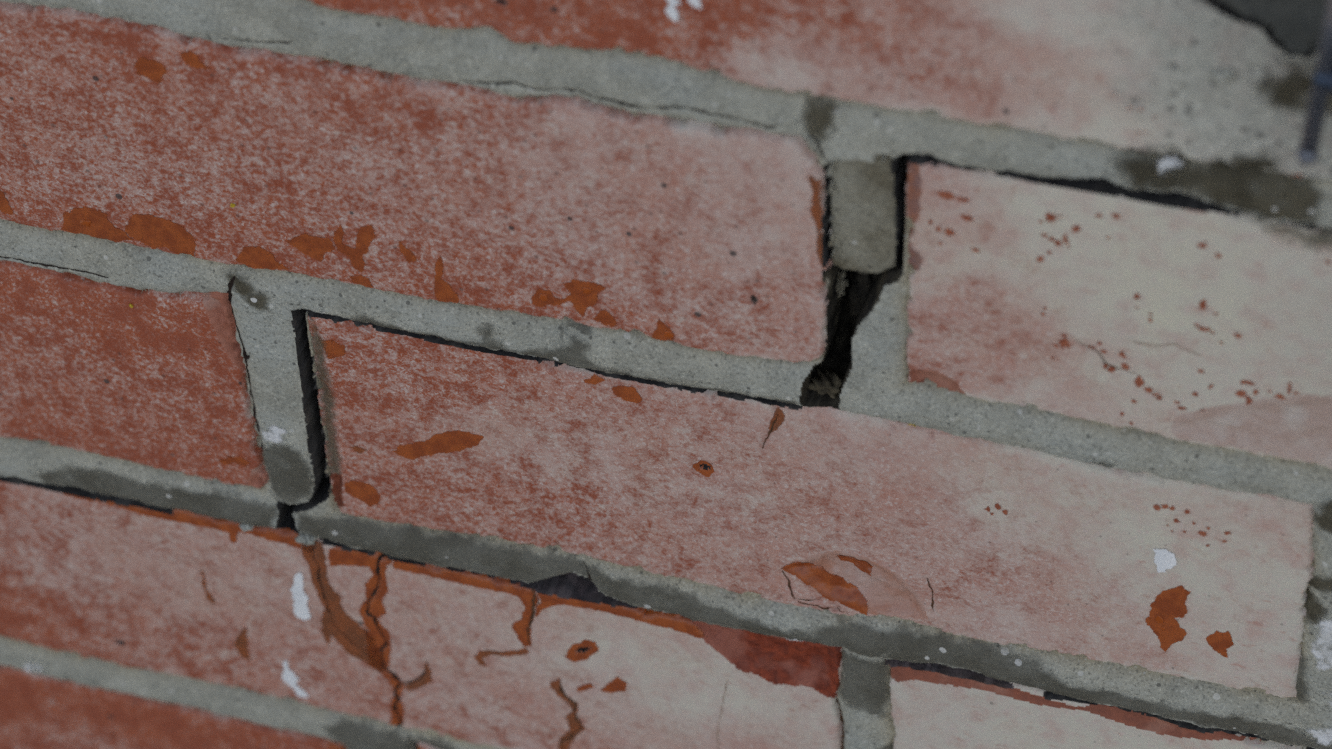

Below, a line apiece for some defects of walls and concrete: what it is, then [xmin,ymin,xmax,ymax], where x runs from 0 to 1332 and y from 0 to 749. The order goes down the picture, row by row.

crack [891,153,1329,276]
damp [1119,151,1332,244]
crack [275,309,803,749]
spalling [446,567,638,608]
damp [41,333,1332,749]
spalling [789,550,928,620]
spalling [658,611,842,699]